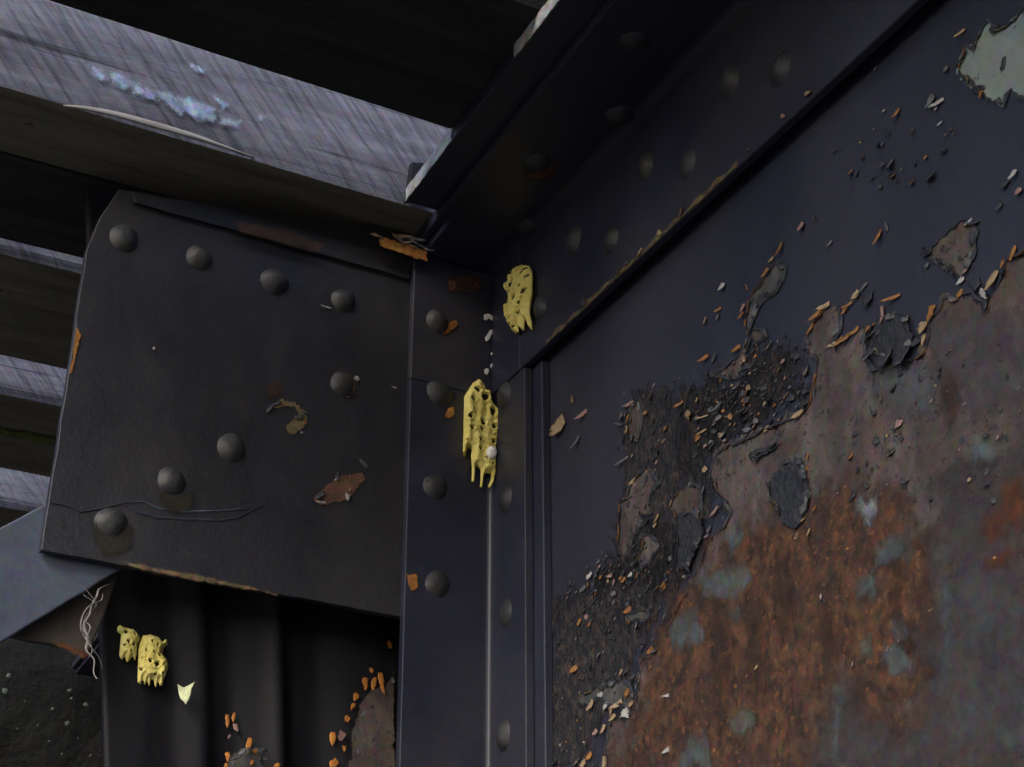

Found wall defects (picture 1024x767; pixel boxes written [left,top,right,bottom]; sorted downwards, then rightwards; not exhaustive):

peeling [942,7,1024,108]
water stain [93,67,236,125]
corrosion [370,232,434,261]
peeling [266,398,307,435]
crack [52,501,263,522]
peeling [549,218,1024,767]
corrosion [614,470,933,767]